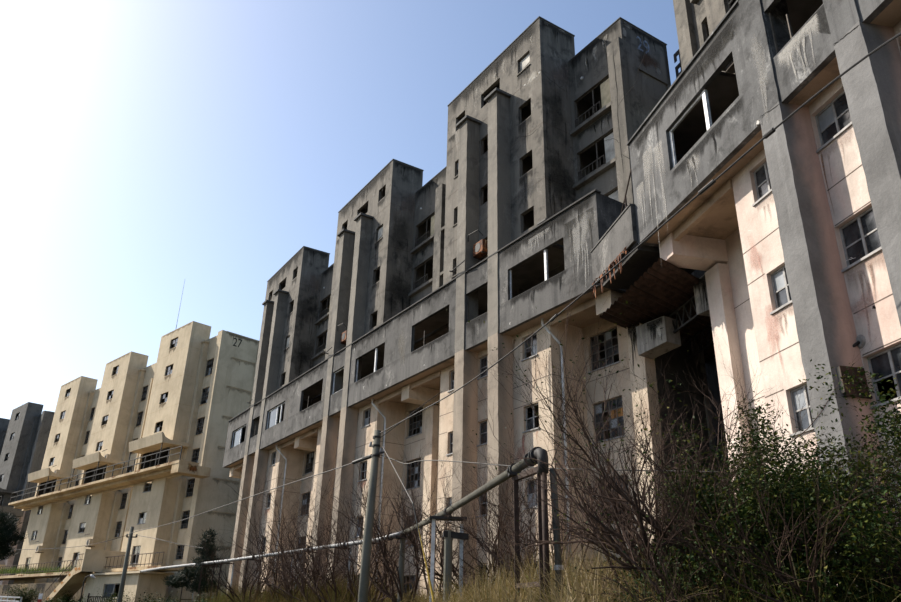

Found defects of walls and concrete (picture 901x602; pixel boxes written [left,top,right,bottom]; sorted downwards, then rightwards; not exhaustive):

water stain [779,4,830,75]
water stain [674,99,742,175]
water stain [504,154,593,304]